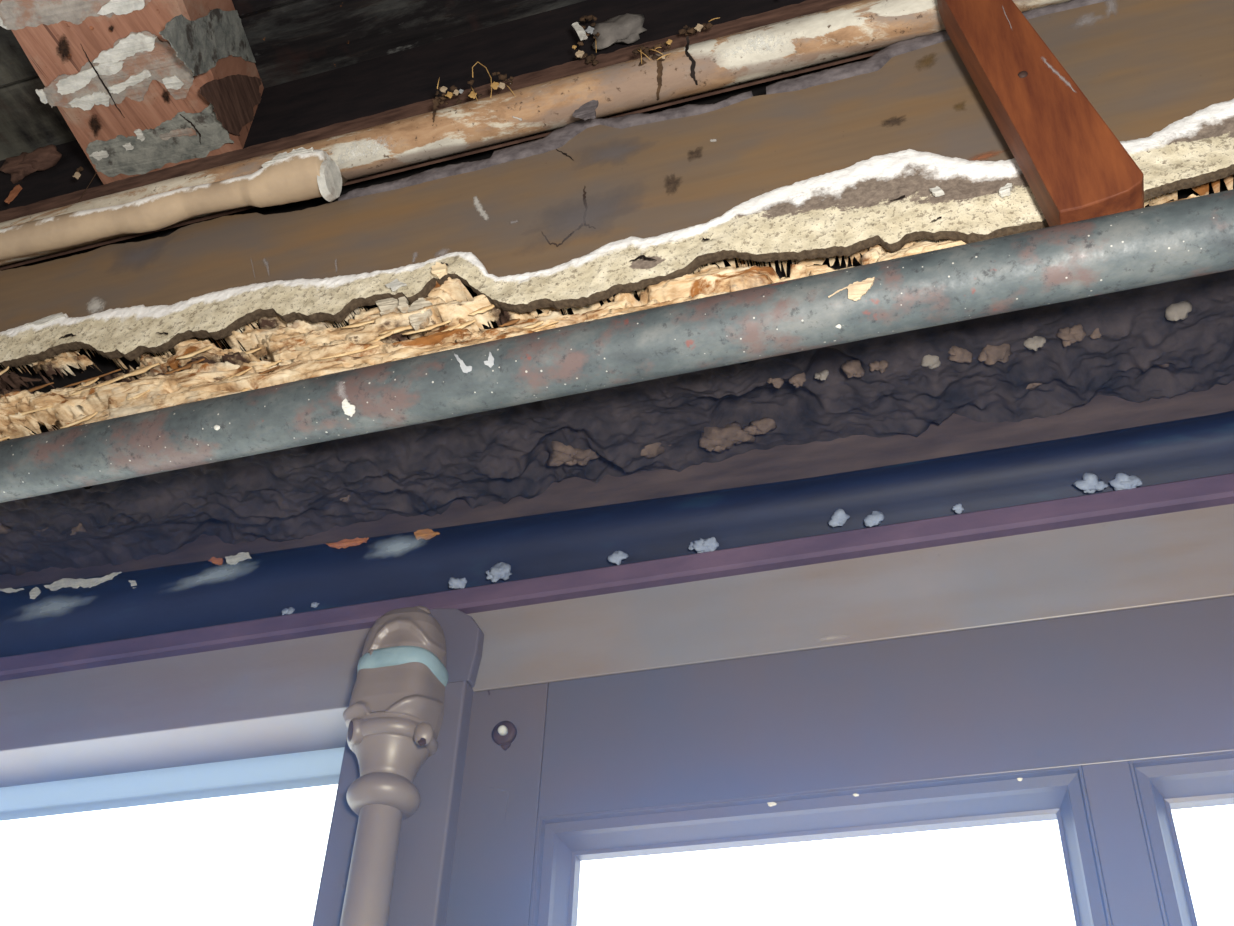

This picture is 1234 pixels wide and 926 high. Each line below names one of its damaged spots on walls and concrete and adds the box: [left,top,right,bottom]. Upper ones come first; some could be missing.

peeling [0,0,151,30]
crack [81,45,125,118]
peeling [36,8,262,177]
crack [685,36,698,85]
spalling [1120,99,1234,200]
spalling [0,149,1049,368]
crack [542,186,596,247]
spalling [0,270,1234,599]